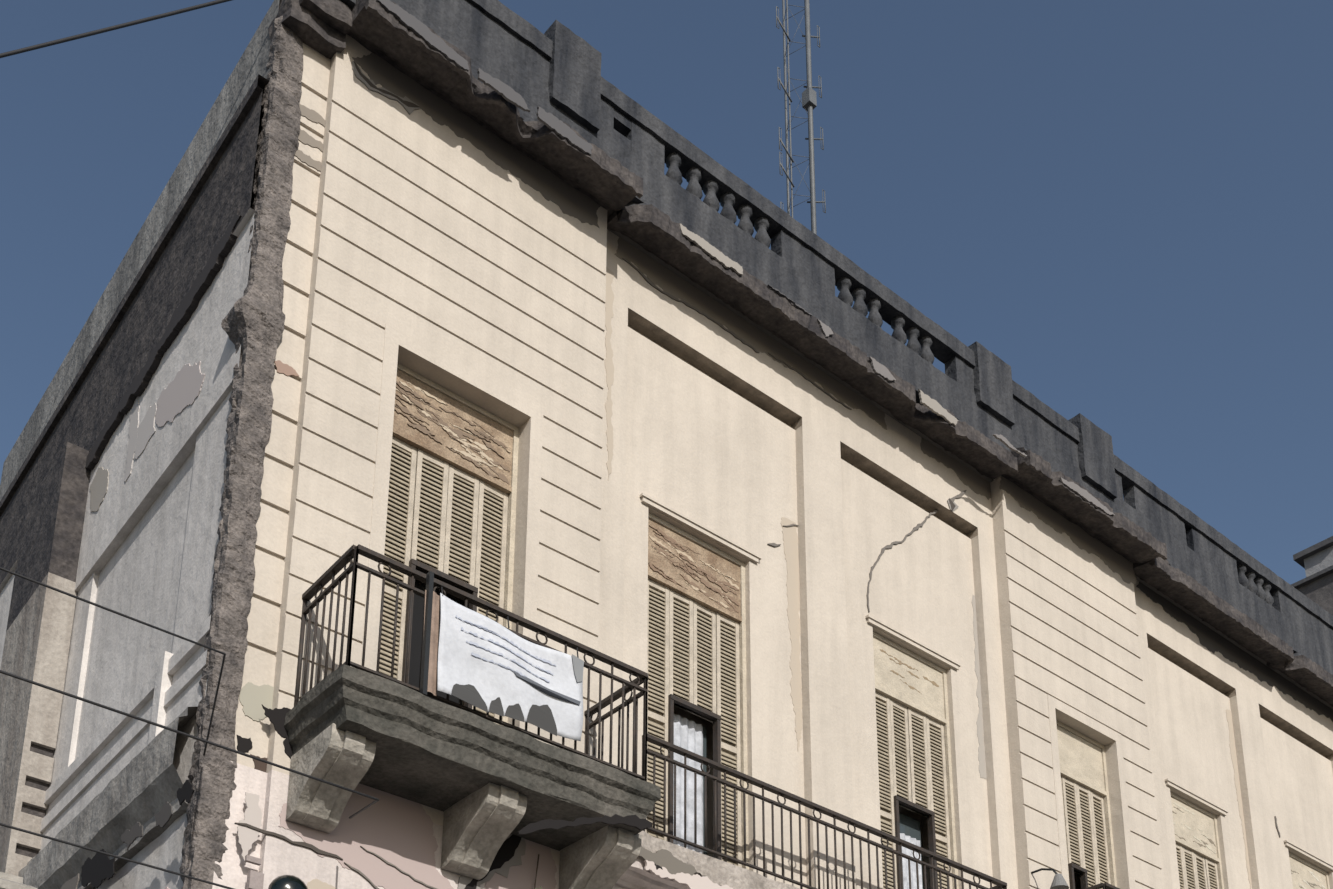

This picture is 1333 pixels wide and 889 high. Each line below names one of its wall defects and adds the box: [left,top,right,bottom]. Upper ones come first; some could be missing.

spalling [352,61,420,115]
peeling [376,0,593,155]
peeling [134,361,205,460]
spalling [165,16,326,889]
peeling [394,381,511,484]
crack [866,490,967,612]
peeling [279,783,557,889]
crack [234,814,653,889]
peeling [644,860,733,889]